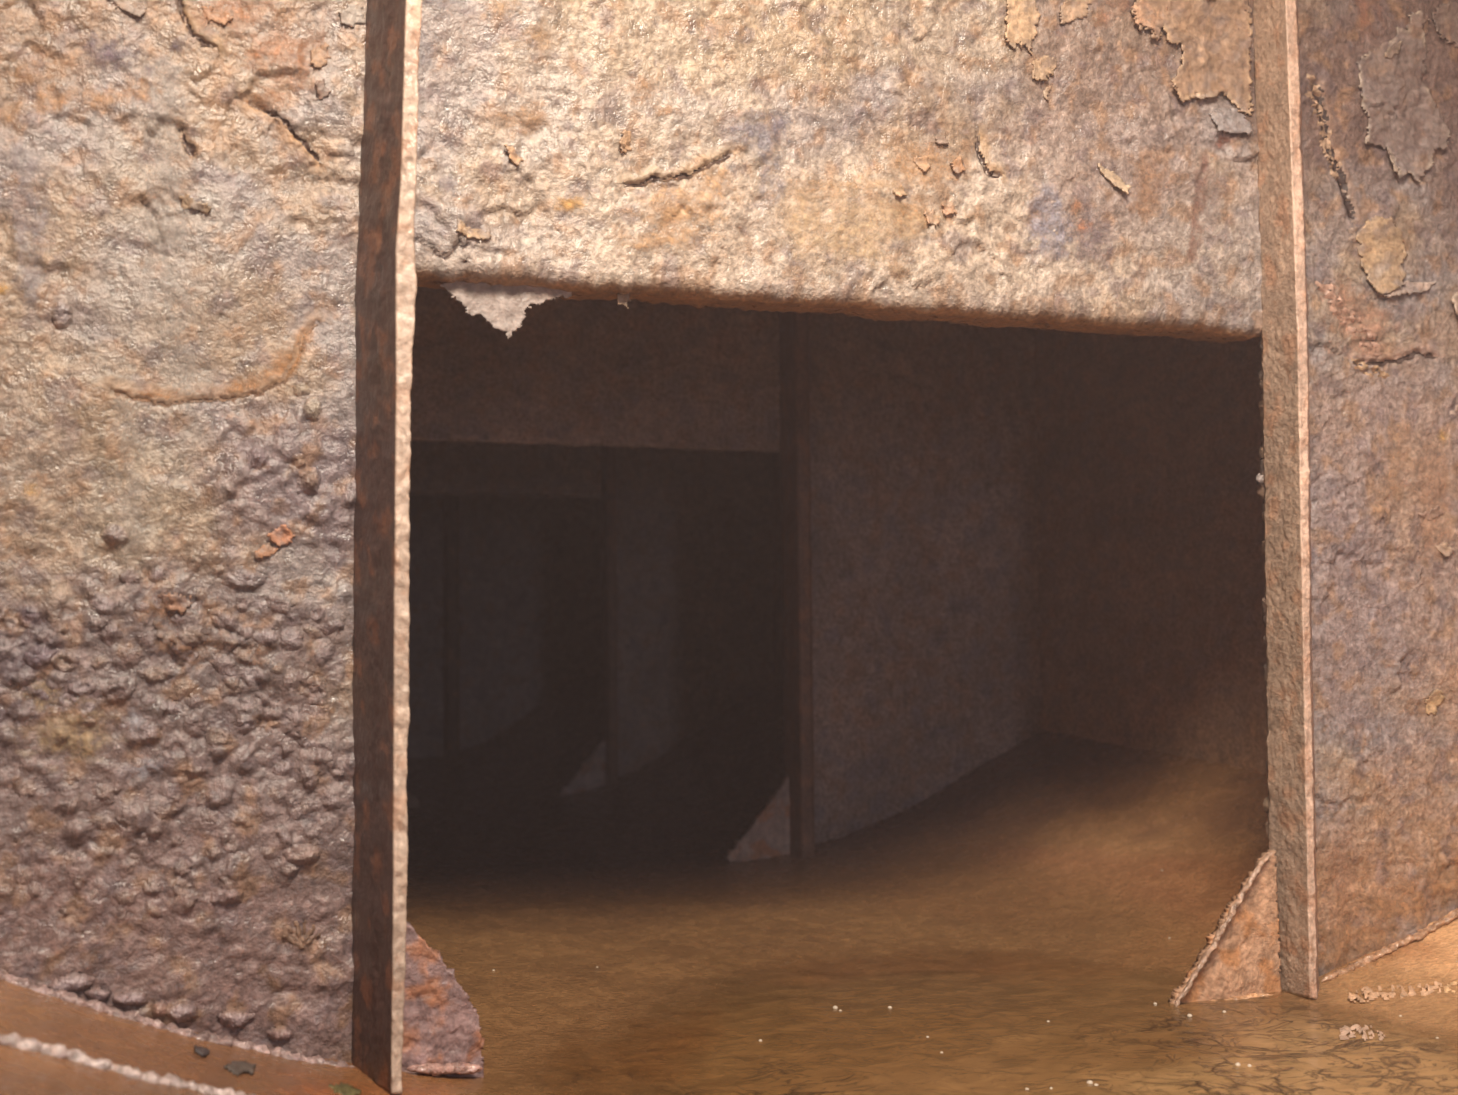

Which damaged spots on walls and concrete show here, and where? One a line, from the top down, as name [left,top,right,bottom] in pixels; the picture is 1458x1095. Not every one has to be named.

peeling [1004,0,1057,101]
peeling [1059,0,1107,25]
peeling [1130,0,1254,146]
peeling [1356,2,1458,183]
peeling [1304,73,1436,298]
peeling [440,281,572,340]
corrosion [0,555,349,878]
corrosion [0,835,42,899]
corrosion [60,766,249,922]